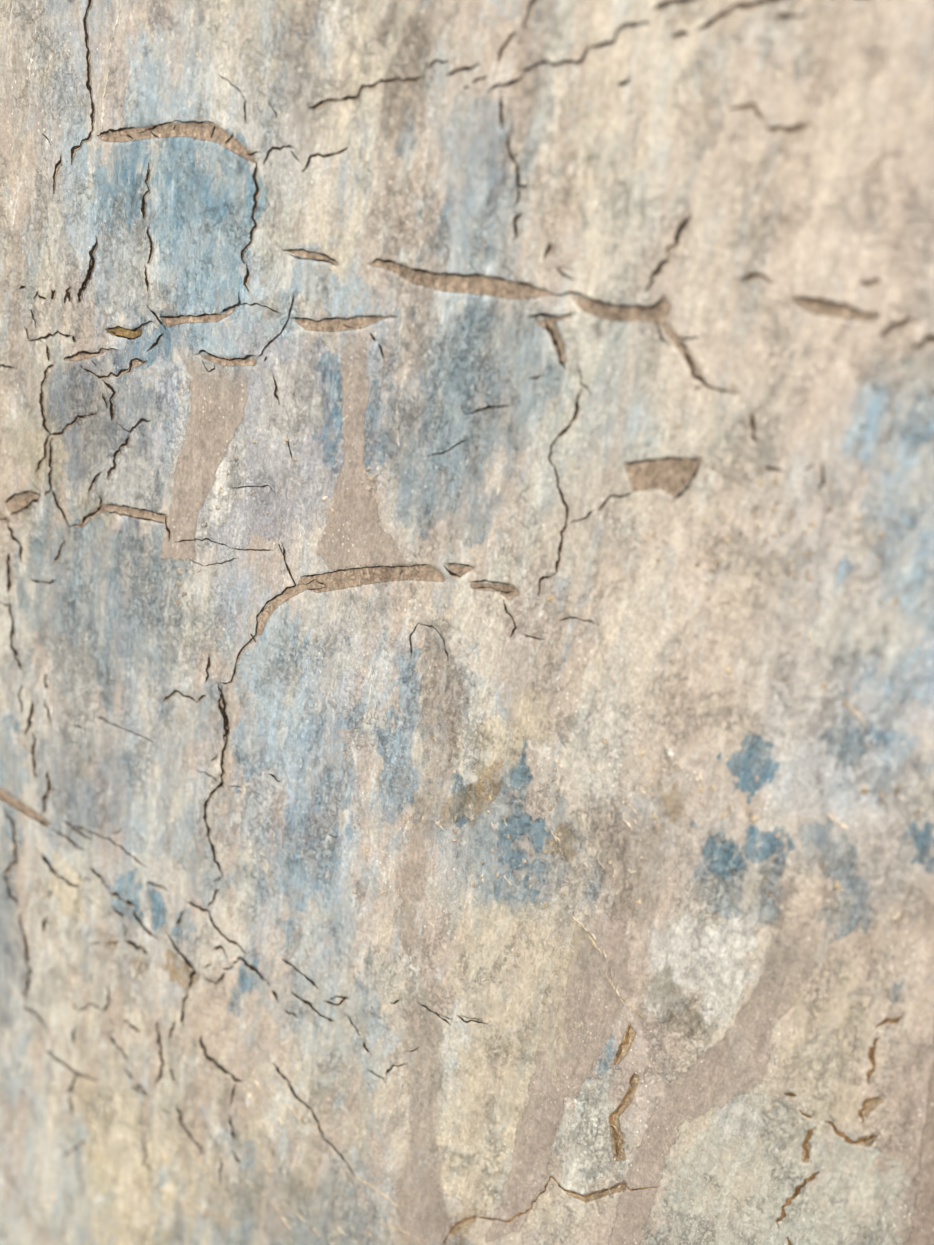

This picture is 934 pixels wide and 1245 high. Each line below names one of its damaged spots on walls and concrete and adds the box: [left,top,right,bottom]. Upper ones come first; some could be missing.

crack [308,0,812,239]
crack [860,278,881,287]
crack [424,405,509,457]
crack [470,215,825,640]
spalling [598,457,702,511]
crack [0,0,419,1206]
crack [409,623,448,658]
crack [392,1000,487,1026]
crack [443,1023,658,1245]